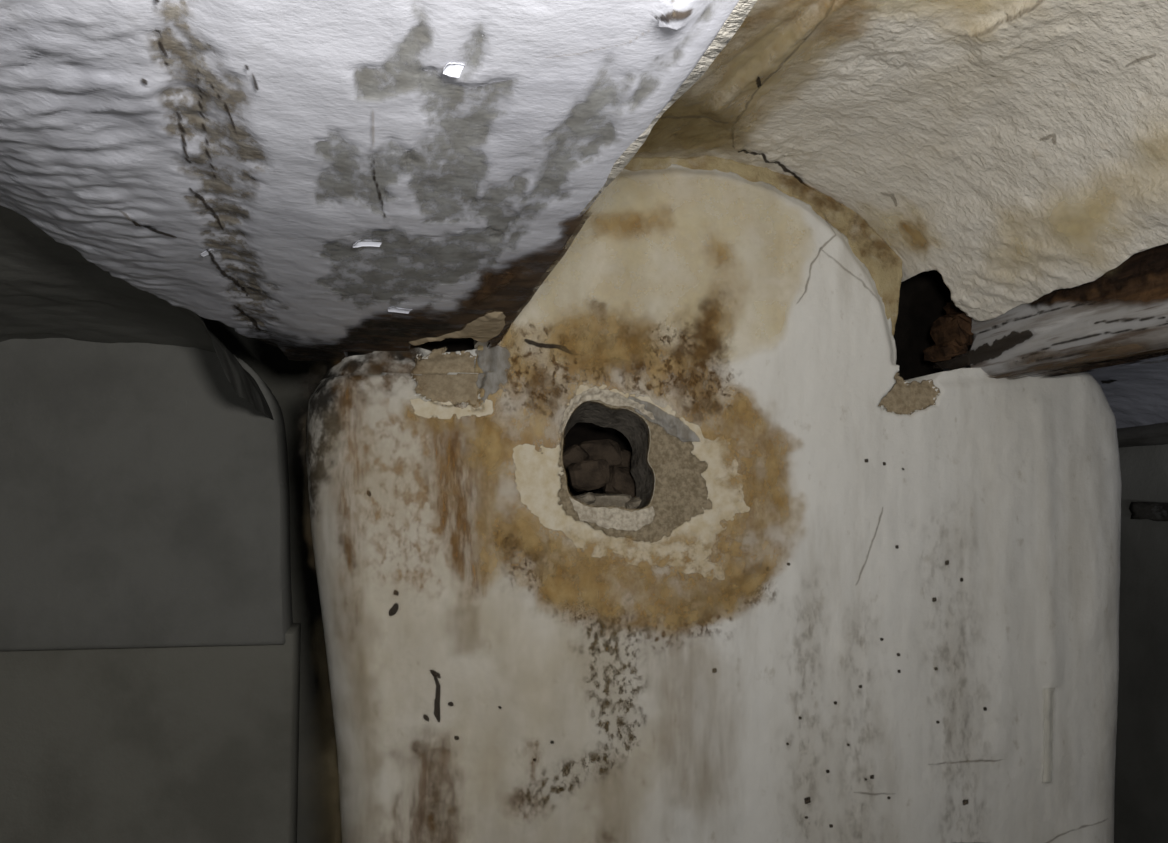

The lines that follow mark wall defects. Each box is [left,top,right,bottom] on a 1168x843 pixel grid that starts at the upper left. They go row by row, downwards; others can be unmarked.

peeling [151,0,287,332]
peeling [316,14,657,314]
damp [636,0,859,154]
spalling [409,312,511,419]
spalling [878,270,971,415]
damp [254,183,791,804]
spalling [513,384,762,589]